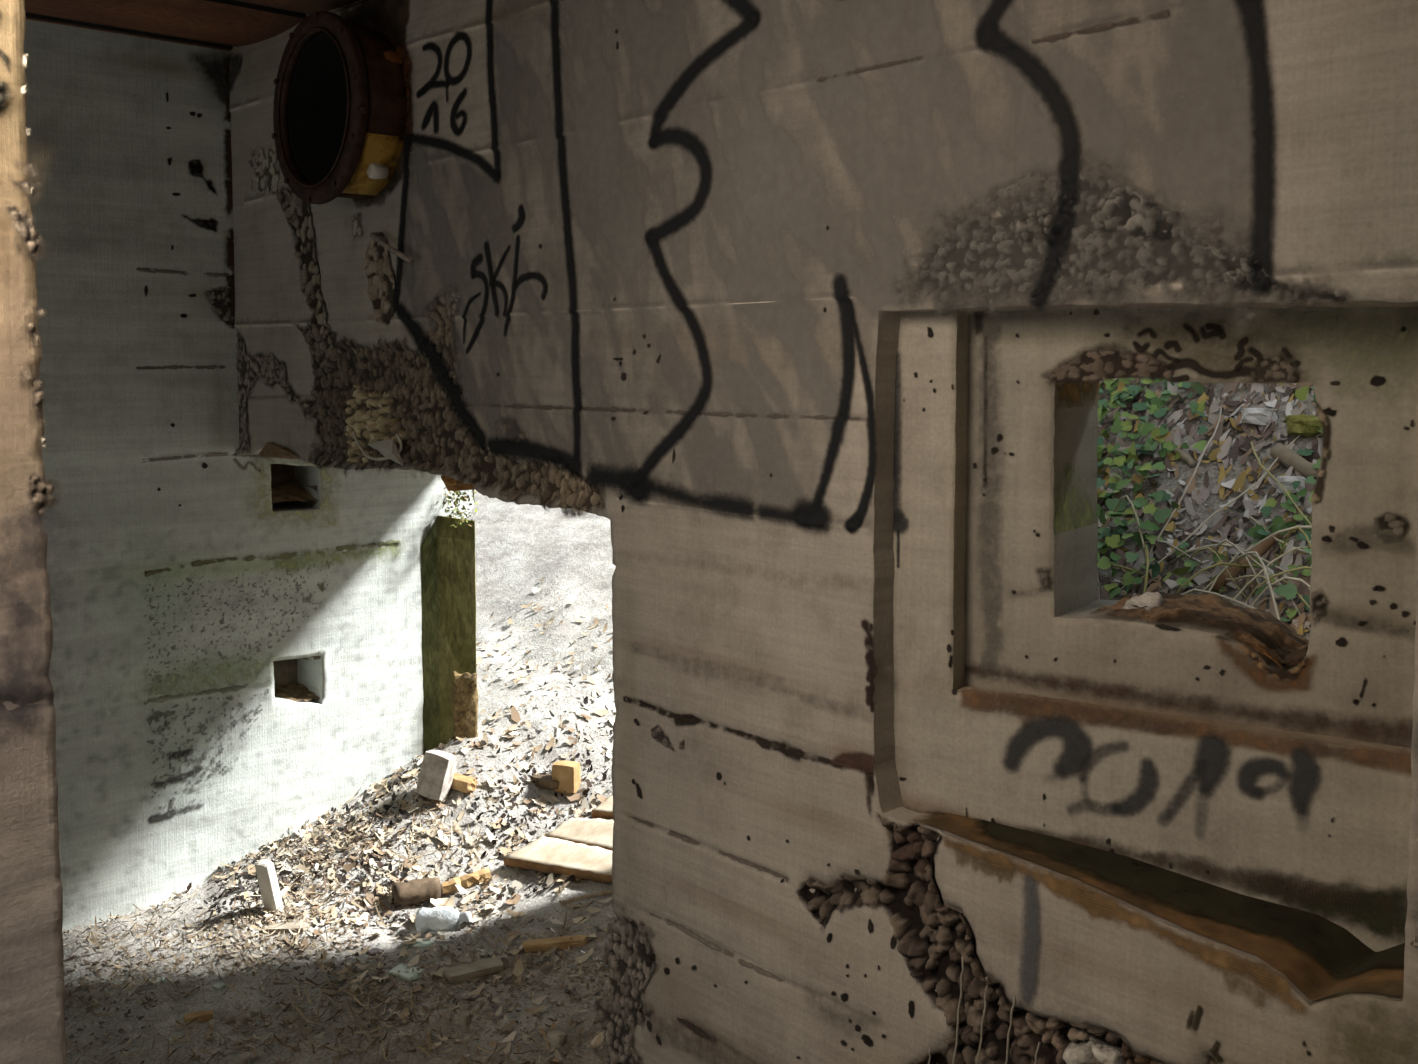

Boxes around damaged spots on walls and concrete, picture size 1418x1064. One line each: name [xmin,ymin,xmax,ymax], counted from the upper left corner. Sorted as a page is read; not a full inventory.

rust [395,46,412,152]
spalling [905,160,1342,320]
spalling [189,148,625,517]
spalling [614,335,661,381]
spalling [1044,333,1173,383]
spalling [1370,376,1386,386]
spalling [1369,585,1416,625]
water stain [0,653,43,727]
spalling [1195,636,1314,690]
crack [623,696,874,793]
spalling [780,815,1156,1064]
spalling [594,916,697,1064]